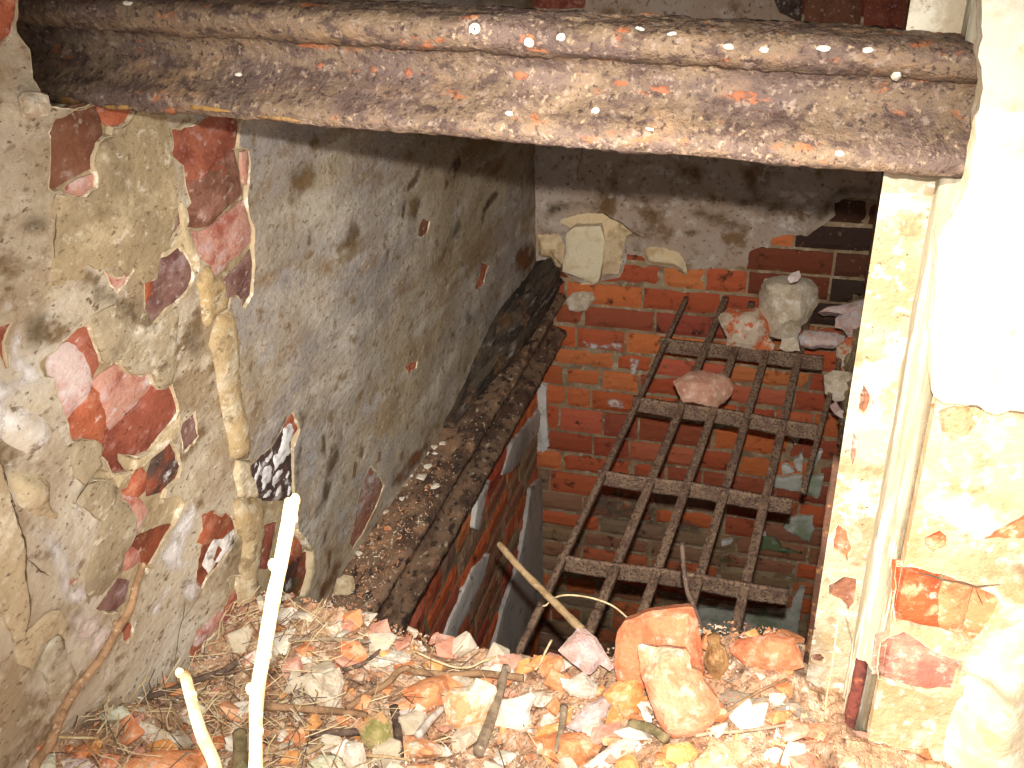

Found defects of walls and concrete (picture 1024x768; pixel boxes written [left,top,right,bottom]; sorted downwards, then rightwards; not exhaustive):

flaking render [534,0,908,29]
flaking render [534,145,882,283]
flaking render [40,102,256,644]
spalling [233,411,301,596]
spalling [281,514,306,604]
spalling [832,524,852,561]
spalling [827,576,858,612]
spalling [871,559,1001,695]